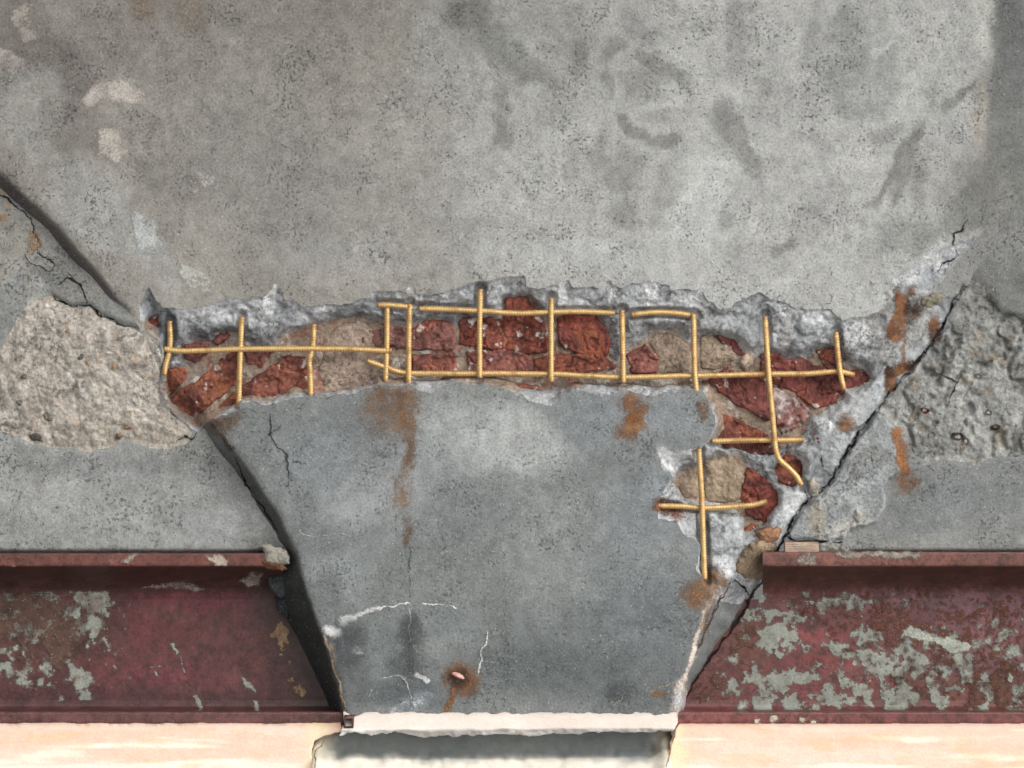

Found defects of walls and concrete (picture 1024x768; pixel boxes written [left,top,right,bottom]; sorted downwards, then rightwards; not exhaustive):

crack [0,195,135,328]
corrosion [884,287,941,392]
crack [268,414,306,486]
corrosion [364,385,420,506]
spalling [139,236,1024,713]
corrosion [615,392,648,440]
crack [777,285,969,552]
corrosion [891,427,919,493]
peeling [0,591,116,701]
corrosion [443,661,478,713]
crack [477,631,488,676]
crack [650,577,763,697]